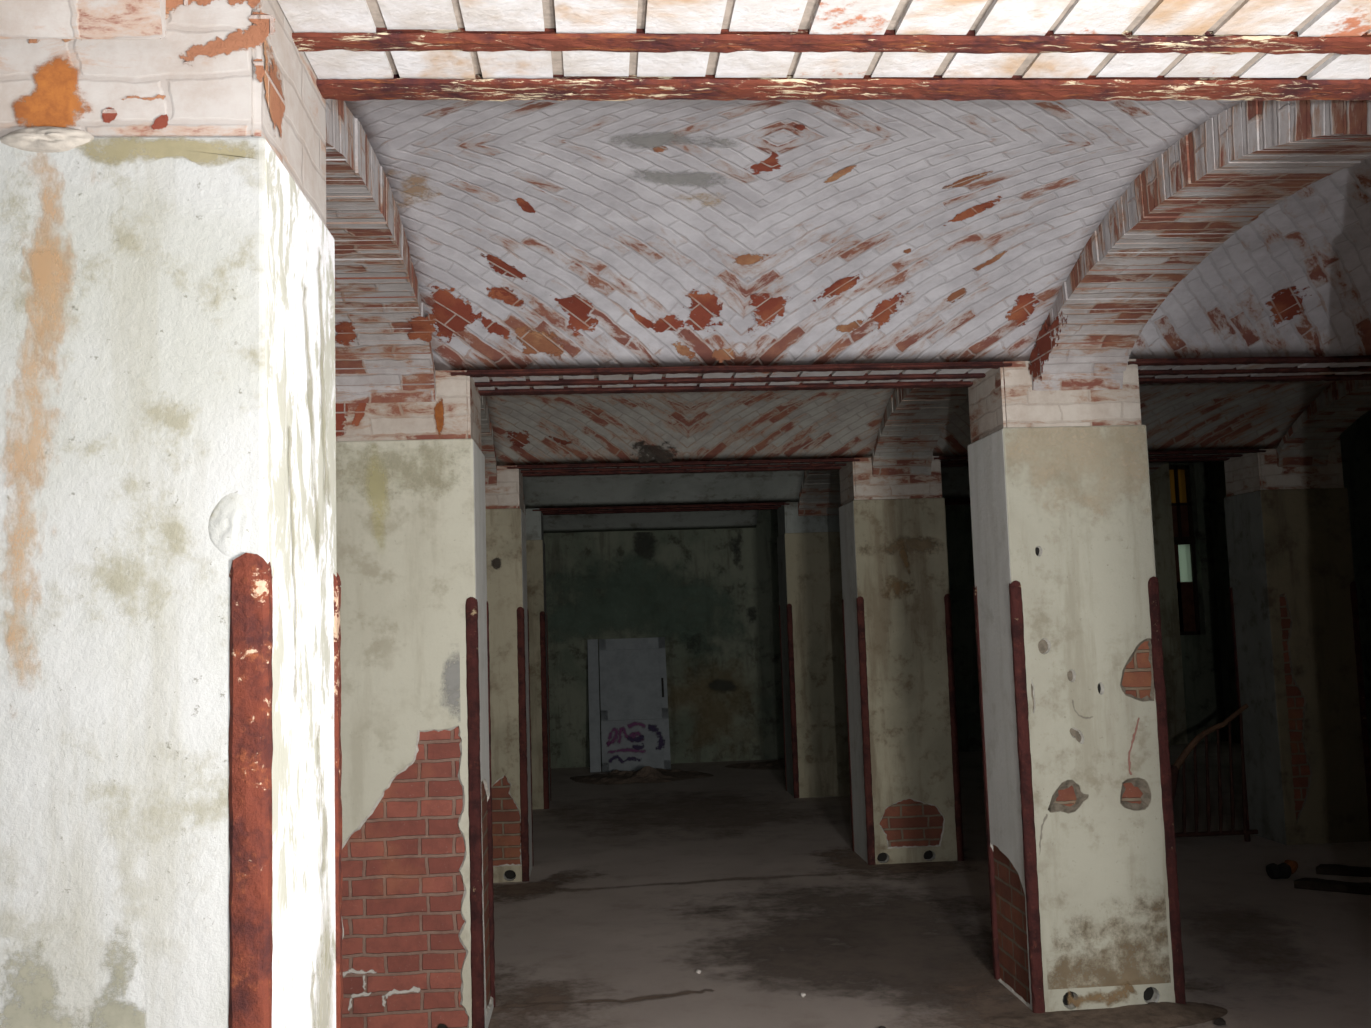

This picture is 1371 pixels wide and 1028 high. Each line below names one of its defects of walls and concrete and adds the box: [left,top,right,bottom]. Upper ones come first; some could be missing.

peeling [515,198,535,213]
peeling [407,253,598,359]
peeling [630,288,736,363]
peeling [746,293,791,336]
peeling [813,273,863,302]
peeling [836,290,910,333]
peeling [1005,288,1068,383]
spalling [1097,638,1155,702]
spalling [1047,780,1089,814]
spalling [1120,777,1152,811]
spalling [879,798,945,864]
spalling [341,725,522,1028]